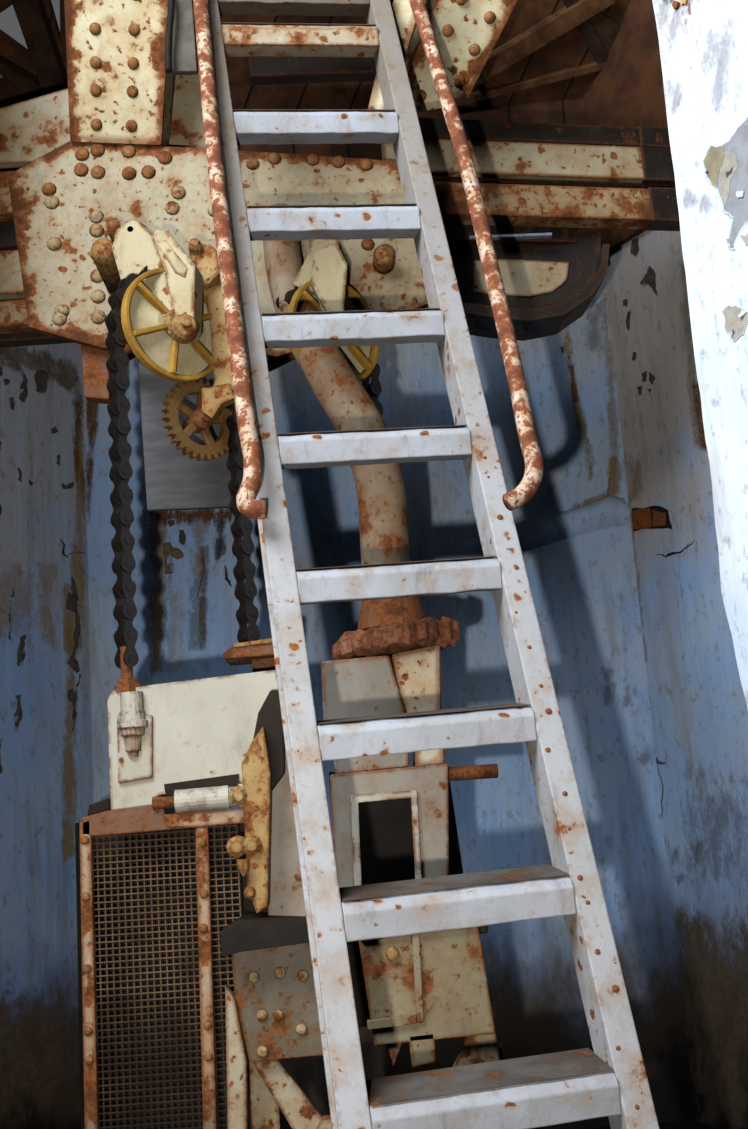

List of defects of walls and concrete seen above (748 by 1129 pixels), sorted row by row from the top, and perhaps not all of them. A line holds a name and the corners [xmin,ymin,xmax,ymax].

spalling [664,0,691,23]
peeling [702,115,748,251]
peeling [622,299,632,331]
peeling [722,304,748,342]
peeling [0,366,50,411]
peeling [631,351,656,396]
crack [656,540,695,557]
peeling [8,612,27,667]
peeling [65,574,82,732]
peeling [13,695,23,732]